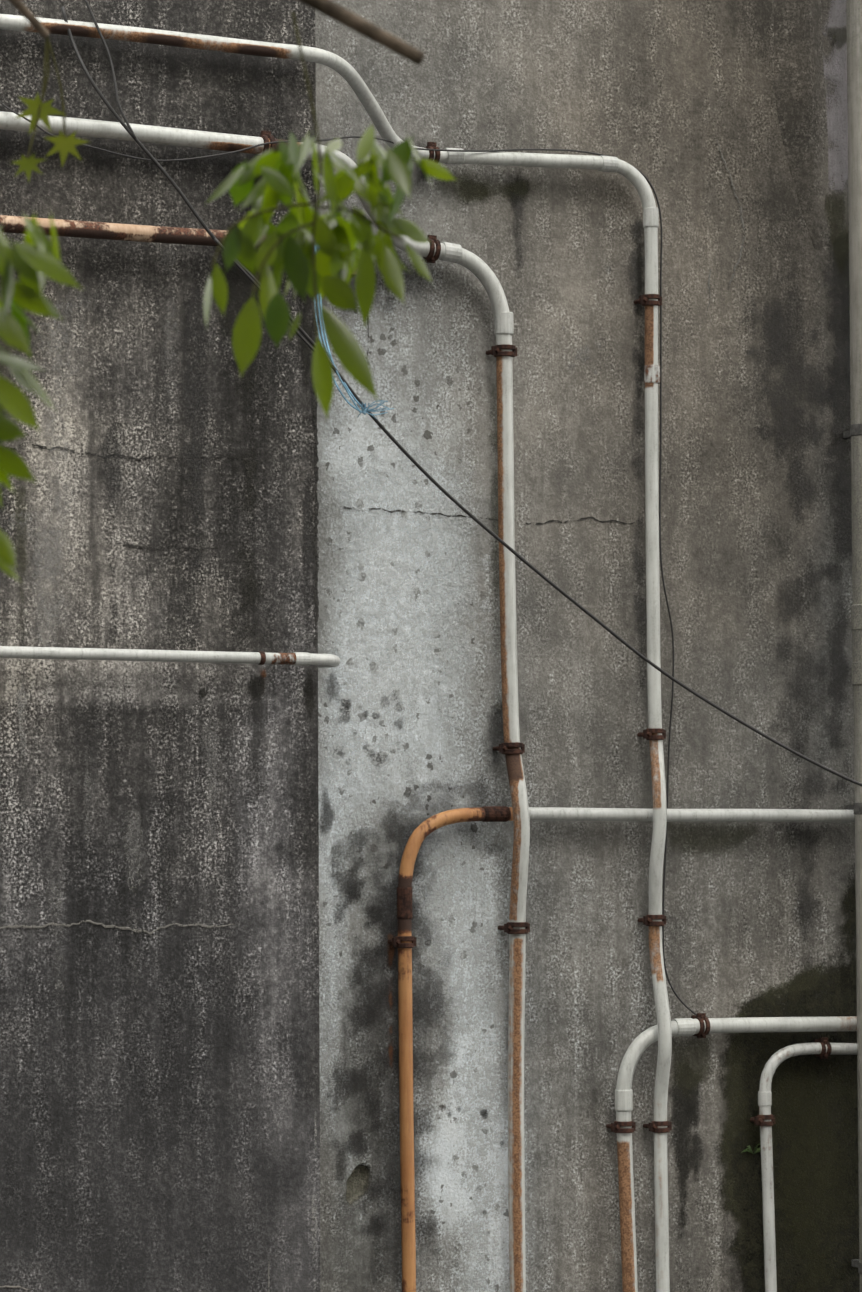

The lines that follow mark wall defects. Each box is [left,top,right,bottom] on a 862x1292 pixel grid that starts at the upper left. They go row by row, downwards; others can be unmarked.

leakage [0,130,264,211]
crack [312,317,320,343]
leakage [181,246,272,521]
leakage [100,422,122,503]
crack [311,377,634,645]
leakage [302,477,314,644]
leakage [247,675,265,796]
leakage [304,671,337,717]
leakage [777,597,849,806]
leakage [321,793,334,831]
leakage [332,832,366,923]
crack [0,920,235,935]